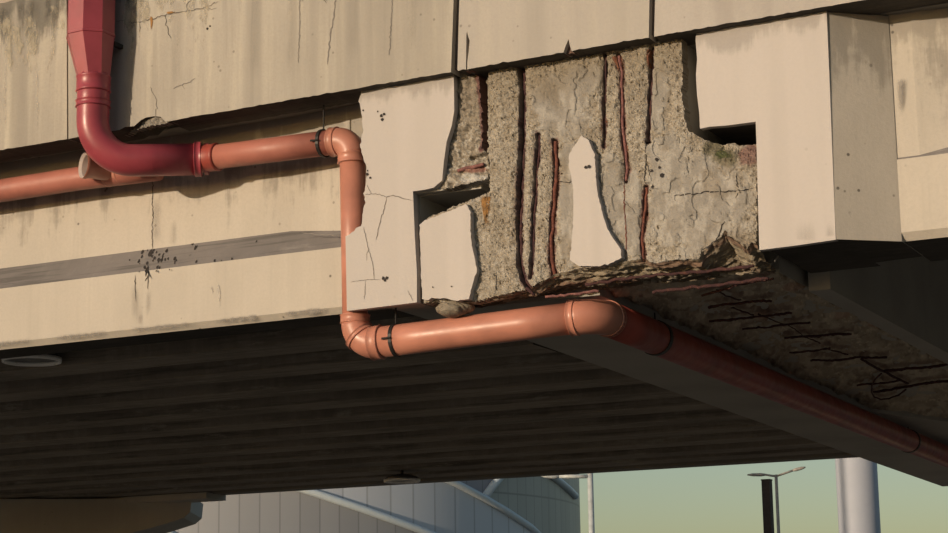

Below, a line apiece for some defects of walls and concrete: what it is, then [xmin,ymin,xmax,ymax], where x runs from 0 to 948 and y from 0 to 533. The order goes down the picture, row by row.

crack [117,0,217,36]
crack [295,1,303,62]
crack [324,0,336,64]
spalling [419,39,776,318]
crack [353,186,410,299]